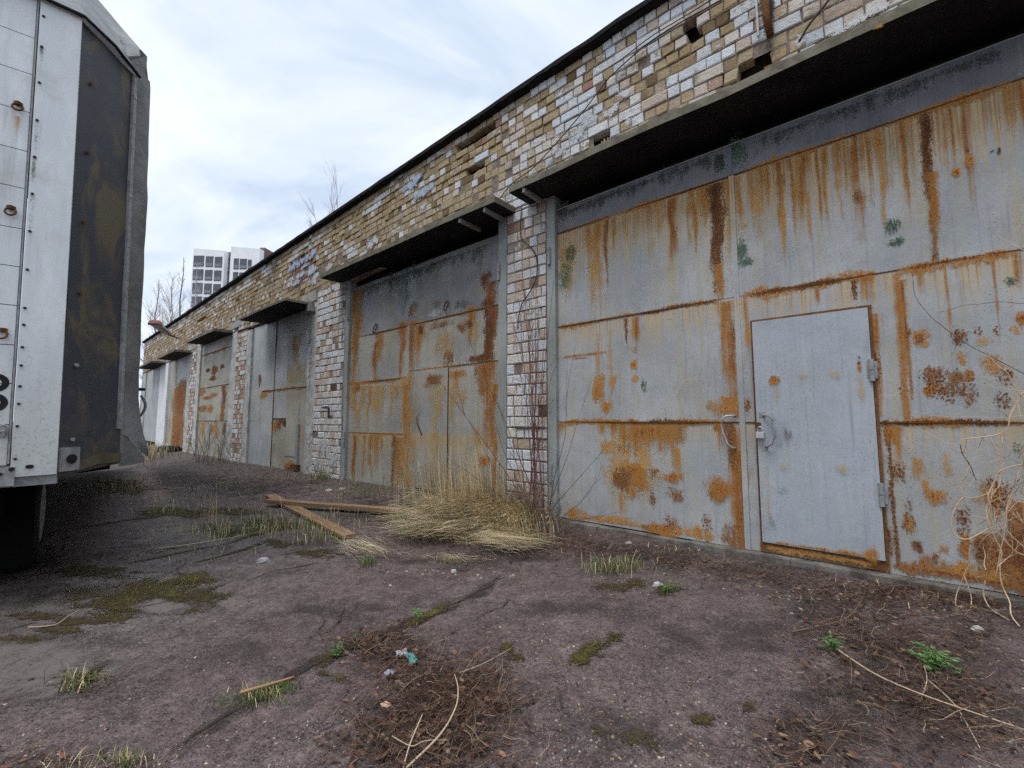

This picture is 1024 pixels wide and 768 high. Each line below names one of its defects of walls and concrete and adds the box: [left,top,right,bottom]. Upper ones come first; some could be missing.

rust [348,271,498,490]
rust [558,80,1024,597]